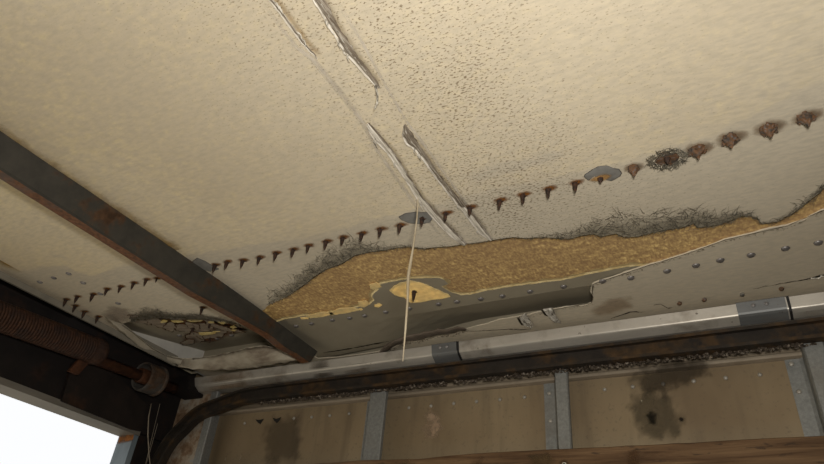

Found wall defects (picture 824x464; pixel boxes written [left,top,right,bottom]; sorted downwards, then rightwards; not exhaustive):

crack [268,0,317,59]
crack [313,0,493,246]
peeling [584,165,622,183]
peeling [262,184,824,322]